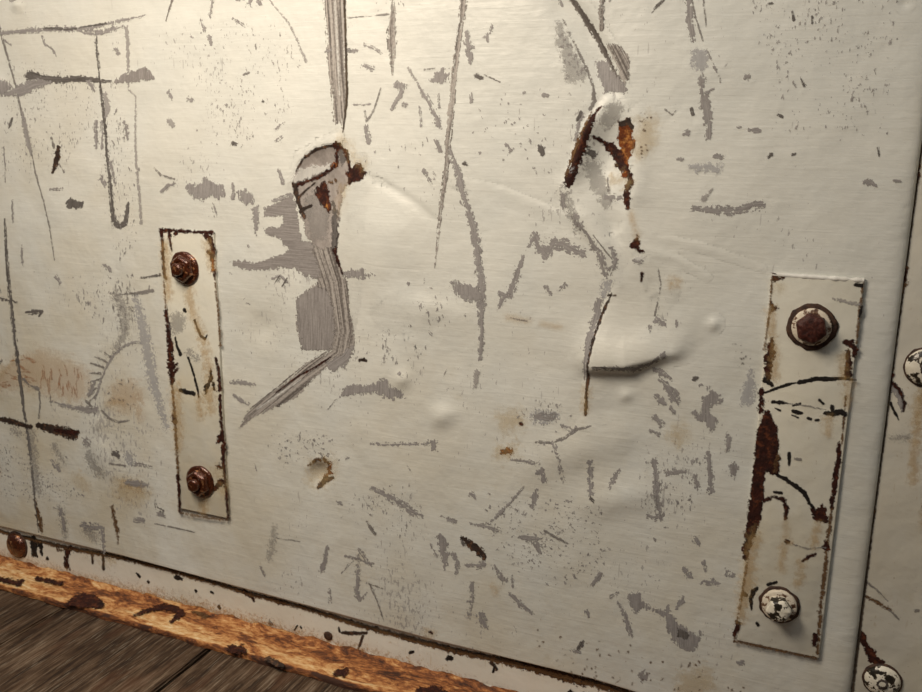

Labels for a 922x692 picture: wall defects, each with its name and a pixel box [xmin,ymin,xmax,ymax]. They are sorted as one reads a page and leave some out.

peeling [2,61,140,202]
peeling [65,197,84,210]
corrosion [292,141,351,219]
peeling [503,132,546,174]
corrosion [563,106,648,210]
peeling [676,153,724,174]
peeling [497,231,587,309]
peeling [648,315,678,332]
peeling [179,368,217,396]
corrosion [307,456,334,489]
corrosion [732,272,847,660]
corrosion [0,499,633,692]